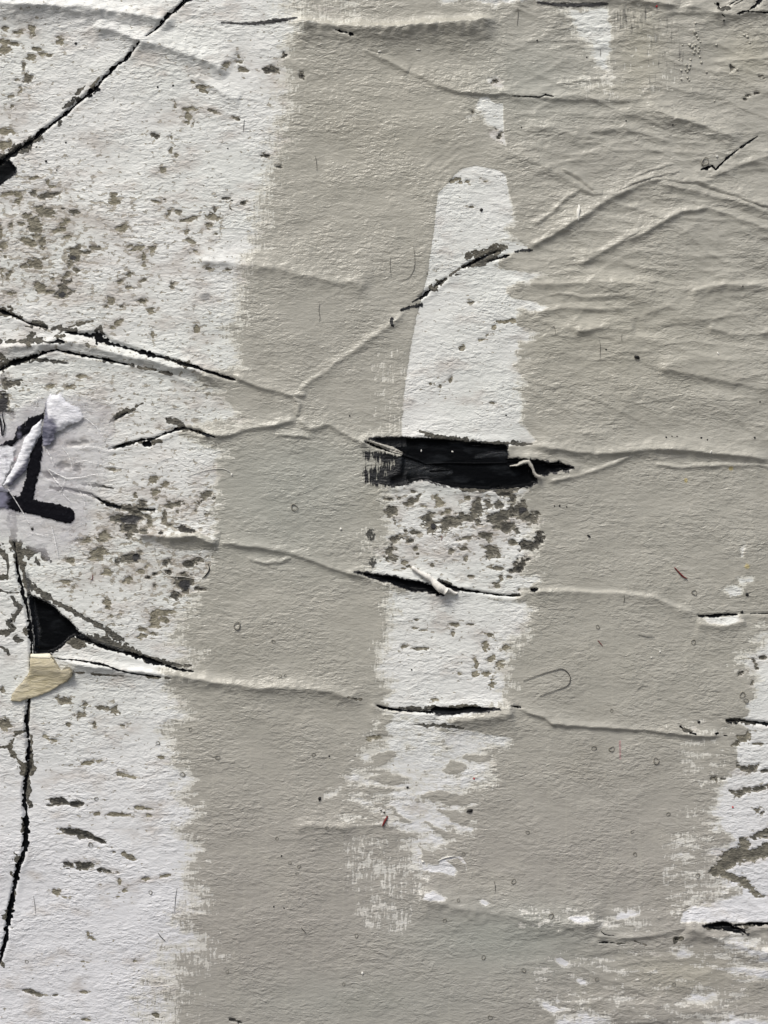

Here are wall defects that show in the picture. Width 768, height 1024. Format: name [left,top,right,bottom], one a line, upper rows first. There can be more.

crack [0,0,191,165]
crack [701,136,758,170]
crack [390,243,533,327]
crack [0,305,236,380]
peeling [0,377,27,418]
peeling [42,462,85,480]
peeling [737,655,767,686]
peeling [731,730,764,747]
peeling [710,762,768,798]
crack [0,698,37,968]
peeling [708,828,768,898]